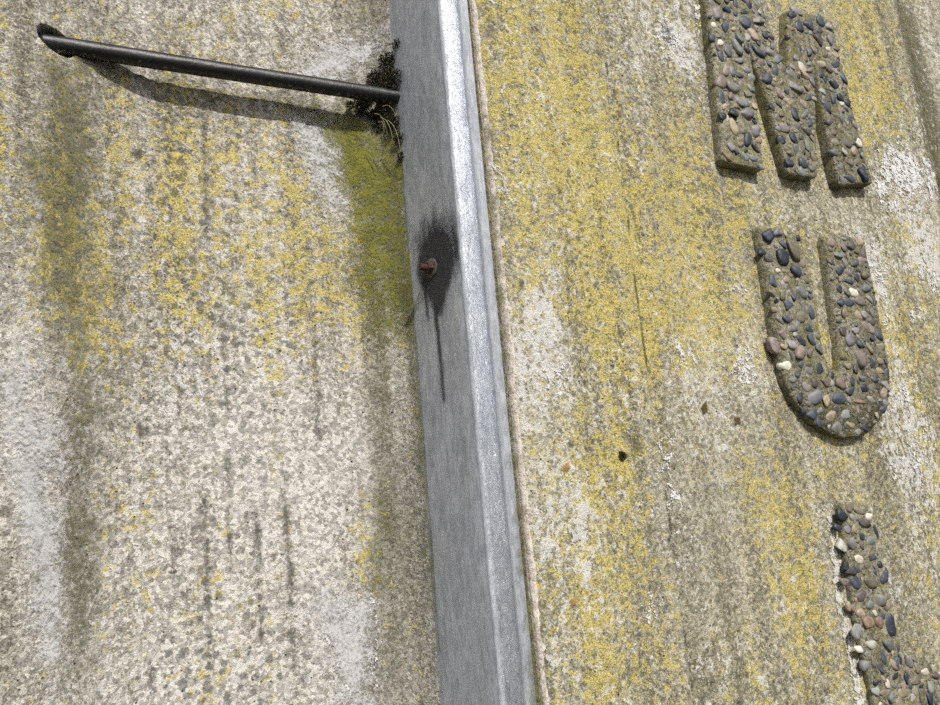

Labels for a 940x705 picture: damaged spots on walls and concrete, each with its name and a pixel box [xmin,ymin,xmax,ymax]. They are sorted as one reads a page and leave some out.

water stain [398,216,459,614]